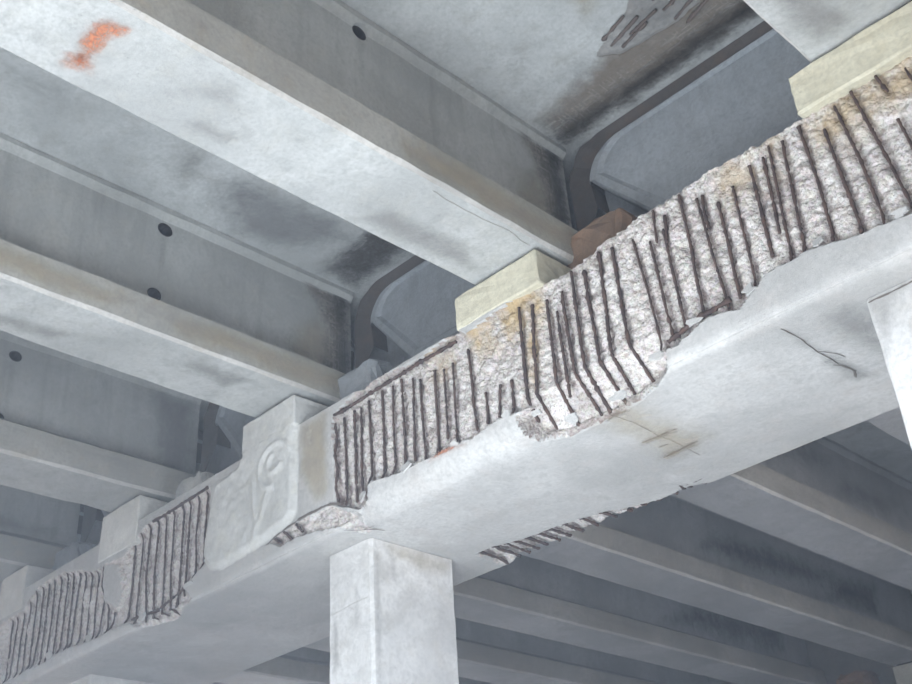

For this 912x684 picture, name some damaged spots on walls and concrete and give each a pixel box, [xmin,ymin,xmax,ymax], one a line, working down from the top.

corrosion [71,24,127,68]
spalling [596,0,709,57]
corrosion [550,0,755,143]
spalling [270,57,912,547]
crack [781,329,857,377]
spalling [479,499,662,564]
spalling [0,486,211,684]